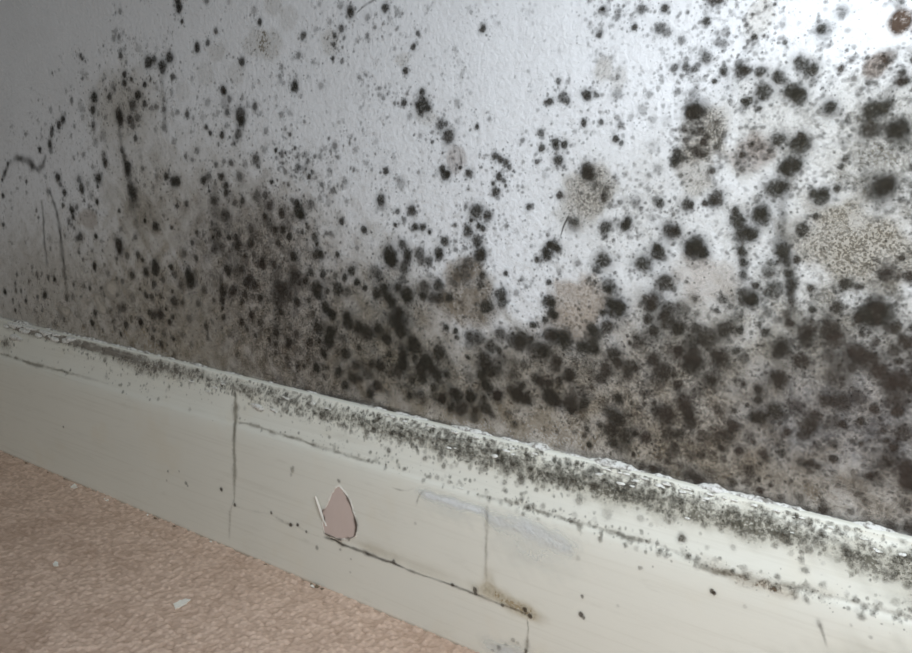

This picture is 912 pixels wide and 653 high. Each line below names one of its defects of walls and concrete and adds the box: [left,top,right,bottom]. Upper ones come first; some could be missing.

leakage [394,89,431,114]
leakage [712,61,807,111]
leakage [794,56,819,77]
leakage [491,153,511,195]
leakage [535,130,567,169]
leakage [671,103,717,167]
leakage [766,133,810,197]
leakage [796,96,912,236]
leakage [4,160,912,533]
peeling [314,485,358,542]
leakage [657,498,817,544]
crack [330,538,399,566]